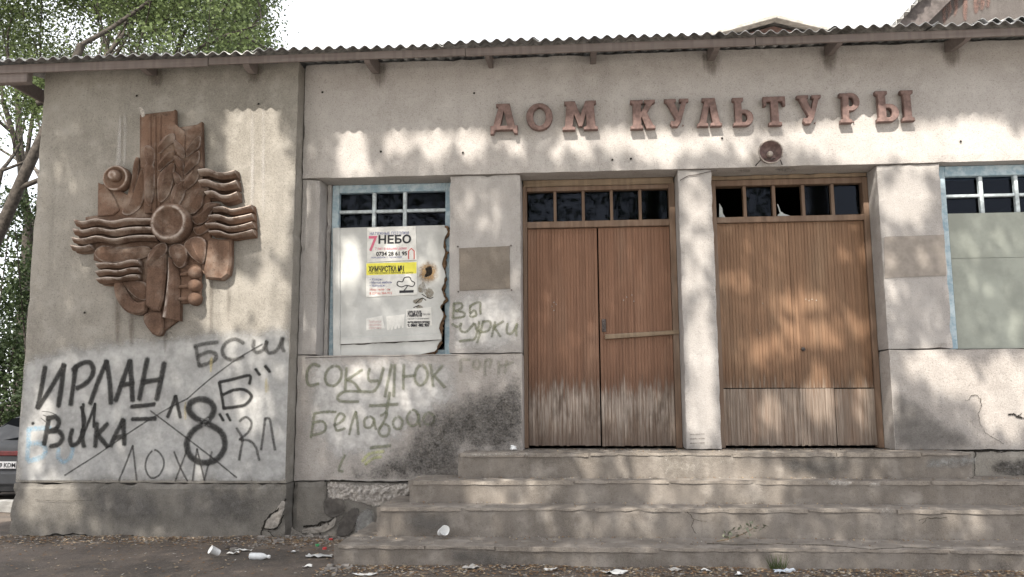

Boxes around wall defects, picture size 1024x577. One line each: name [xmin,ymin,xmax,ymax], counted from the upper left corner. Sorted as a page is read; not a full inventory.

crack [965,395,1024,476]
spalling [260,498,336,537]